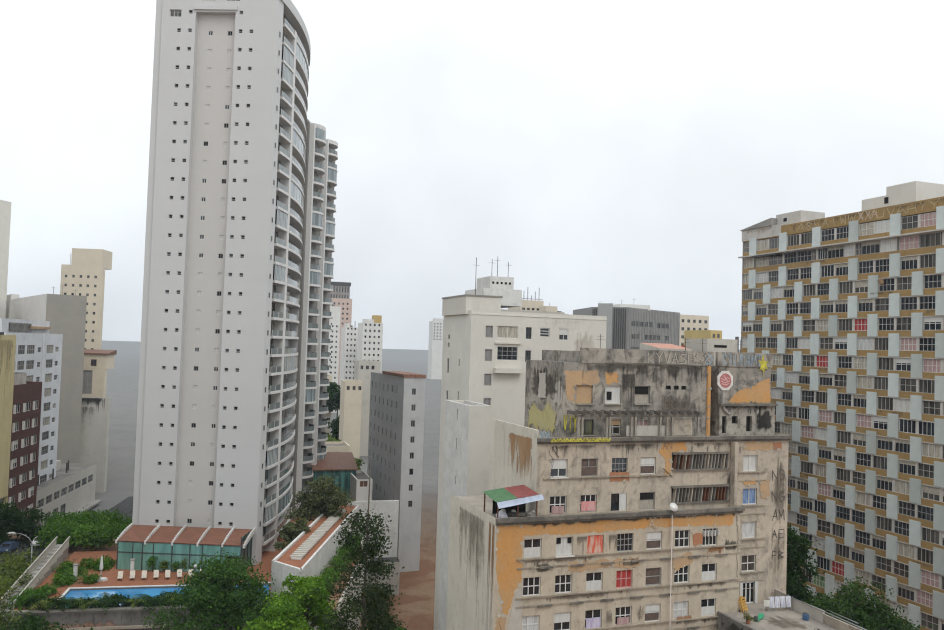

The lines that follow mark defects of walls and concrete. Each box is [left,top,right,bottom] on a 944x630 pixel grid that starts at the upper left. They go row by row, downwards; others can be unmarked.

peeling [527,370,621,433]
damp [590,365,702,404]
damp [725,406,772,429]
peeling [729,378,771,404]
peeling [659,442,687,477]
peeling [495,514,735,630]